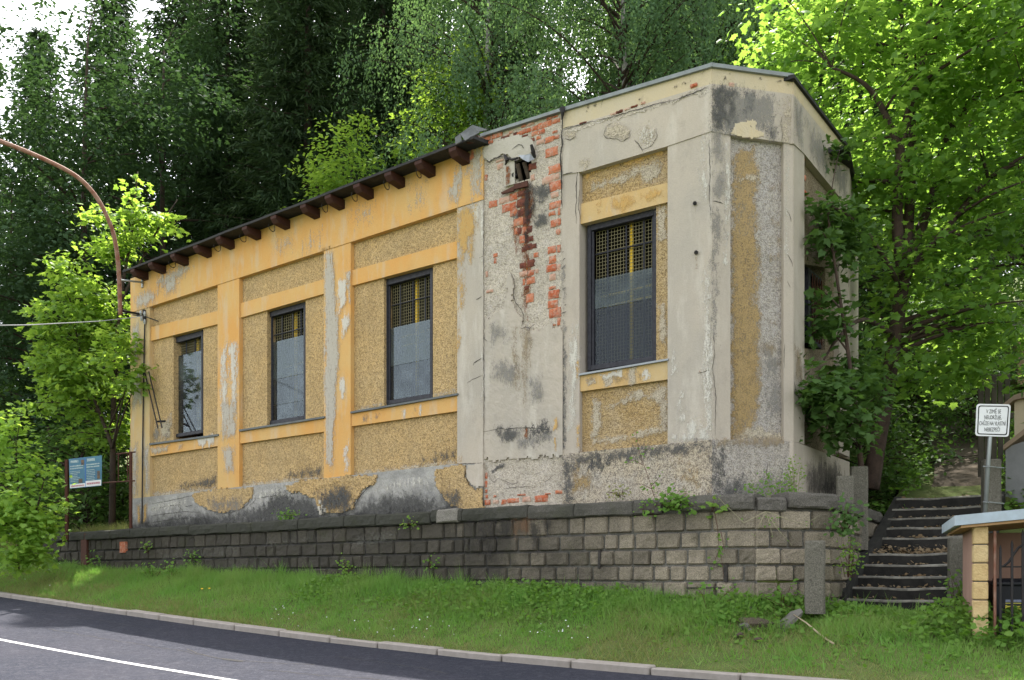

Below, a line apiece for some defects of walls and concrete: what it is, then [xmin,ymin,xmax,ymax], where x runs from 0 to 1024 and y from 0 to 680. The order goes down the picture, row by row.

peeling [731,119,764,139]
peeling [447,82,710,331]
peeling [198,341,240,472]
peeling [275,234,351,472]
leakage [493,83,788,504]
peeling [192,487,254,515]
peeling [434,454,562,509]